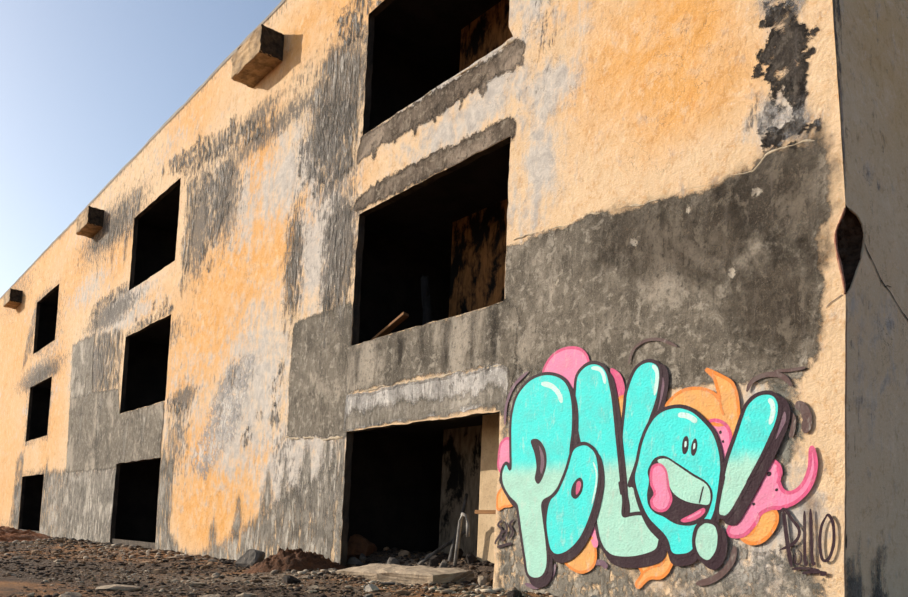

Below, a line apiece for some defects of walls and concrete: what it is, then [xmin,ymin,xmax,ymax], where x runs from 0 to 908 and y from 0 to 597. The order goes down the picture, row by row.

leakage [180,177,197,293]
leakage [281,219,303,333]
peeling [256,0,865,441]
crack [865,245,908,320]
leakage [89,282,173,411]
leakage [9,454,24,529]
leakage [39,464,116,543]